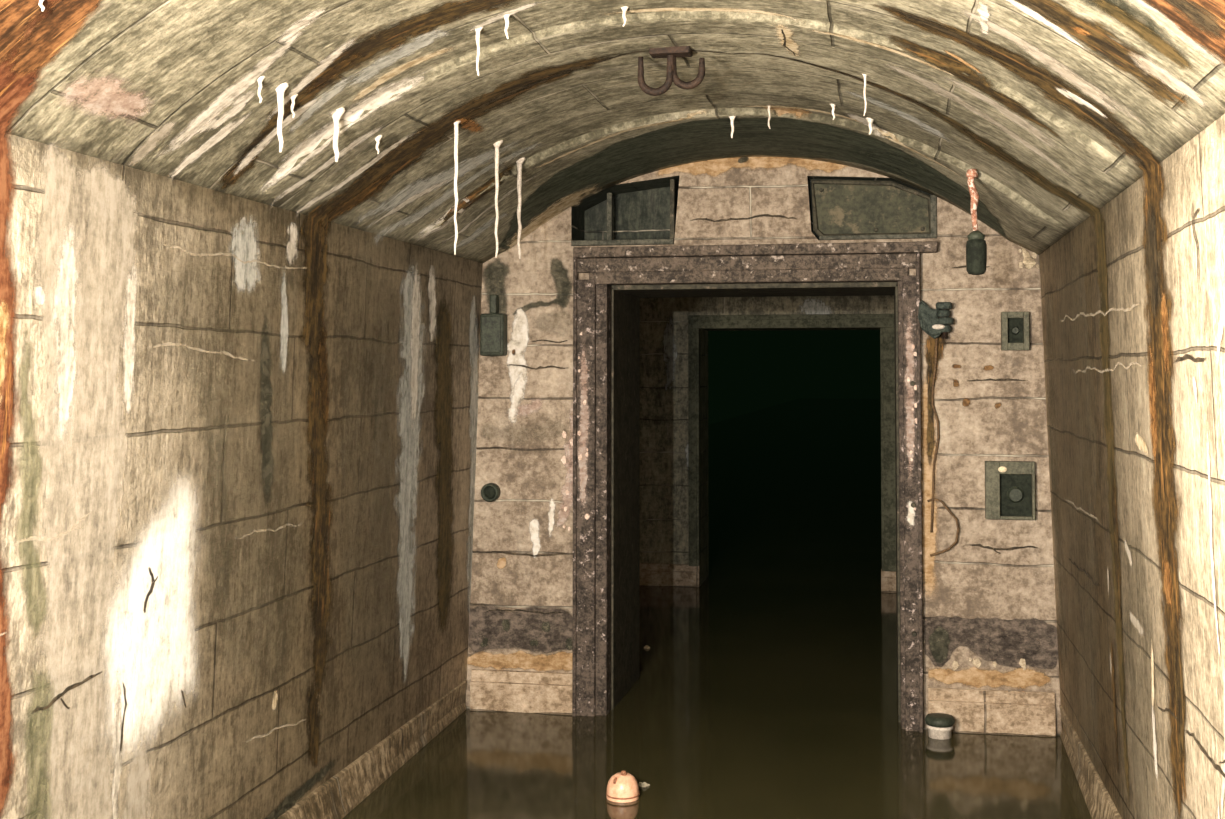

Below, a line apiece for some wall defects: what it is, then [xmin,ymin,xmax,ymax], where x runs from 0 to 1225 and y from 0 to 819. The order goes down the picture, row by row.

efflorescence [66,77,146,116]
efflorescence [133,11,324,177]
efflorescence [237,31,451,199]
rust [1144,0,1225,63]
rust [0,0,100,521]
efflorescence [232,219,257,290]
water stain [17,147,194,819]
water stain [396,186,597,674]
rust [885,0,1186,819]
rust [0,555,15,816]
spalling [923,616,1058,670]
crack [1158,707,1225,778]